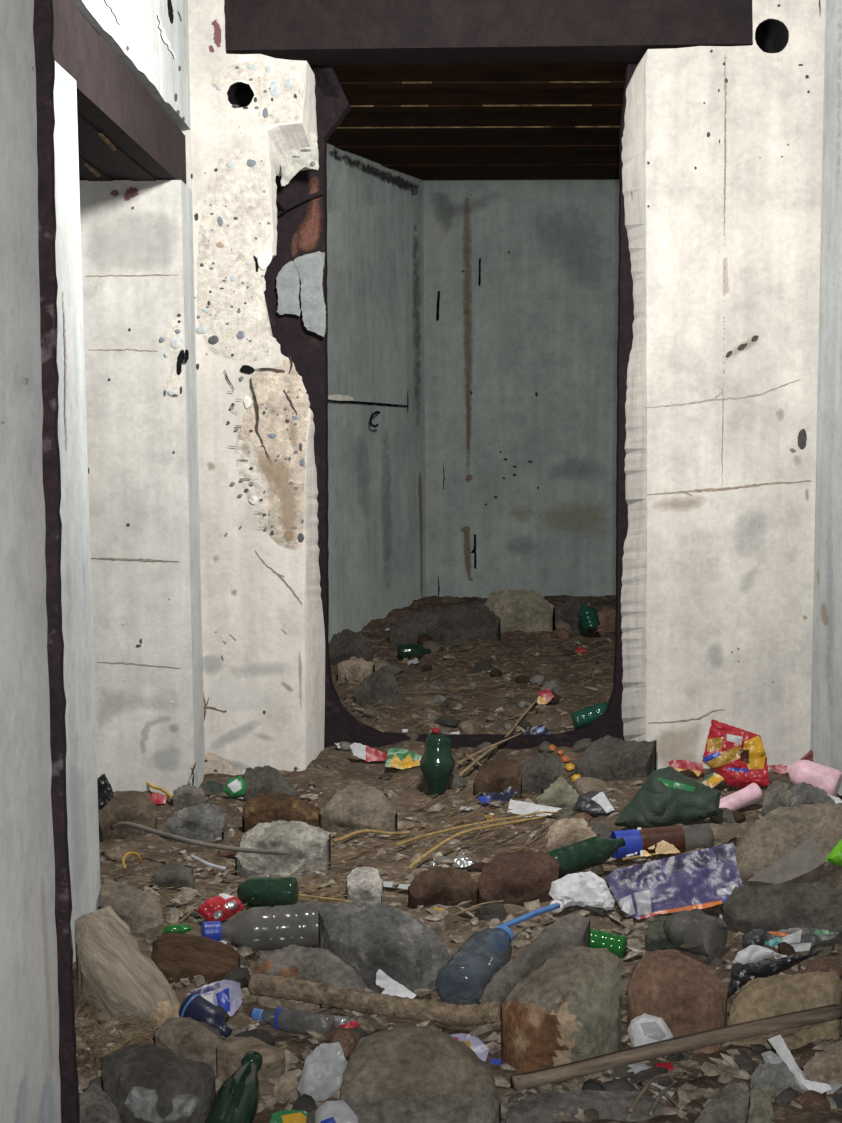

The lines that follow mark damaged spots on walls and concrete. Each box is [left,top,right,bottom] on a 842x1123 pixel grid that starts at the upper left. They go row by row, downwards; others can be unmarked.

spalling [211,61,304,124]
corrosion [292,178,320,256]
spalling [159,132,326,550]
crack [224,356,302,604]
corrosion [461,527,473,581]